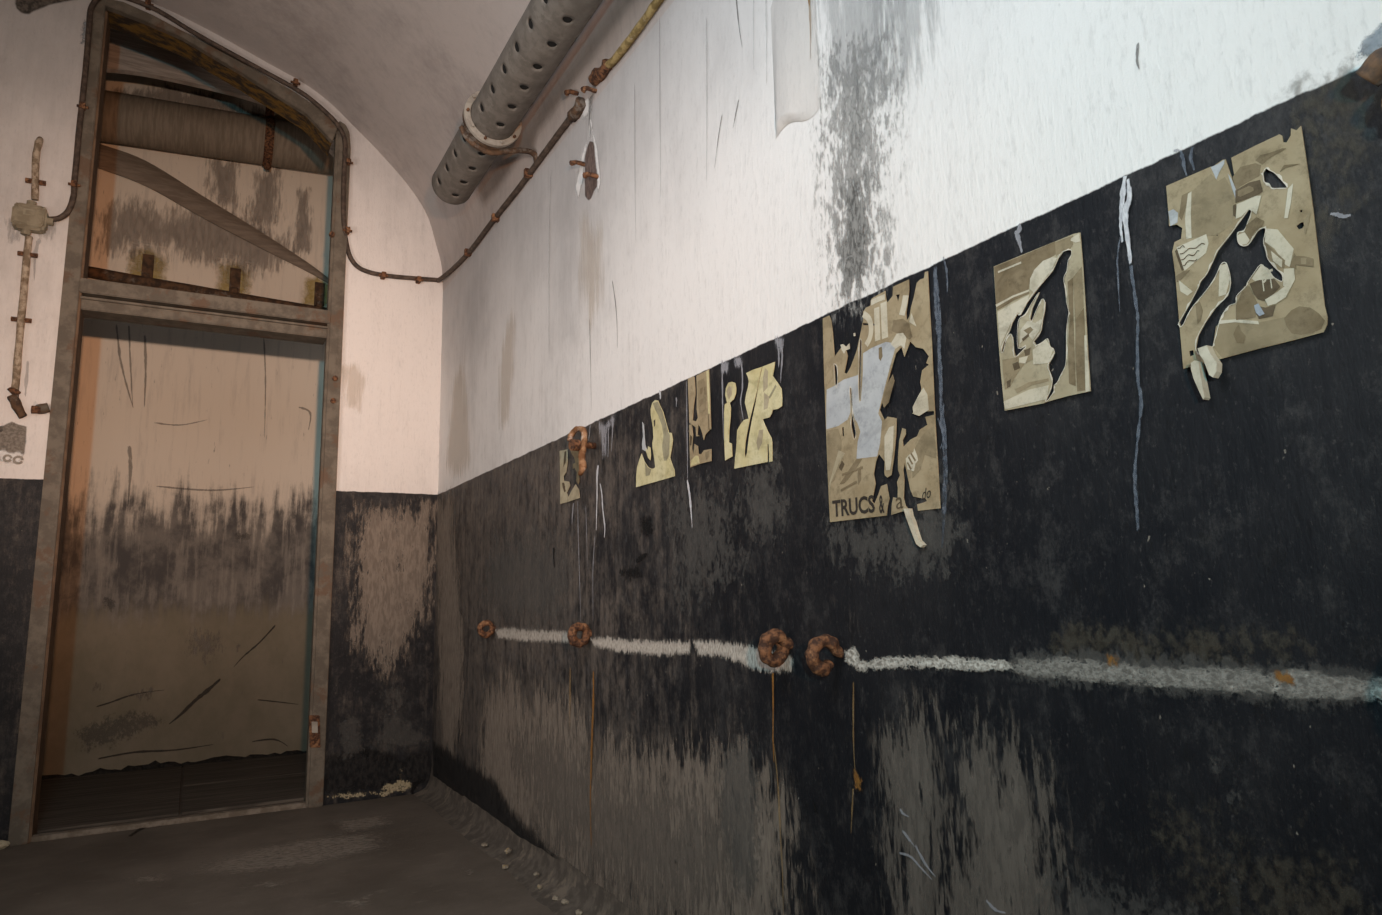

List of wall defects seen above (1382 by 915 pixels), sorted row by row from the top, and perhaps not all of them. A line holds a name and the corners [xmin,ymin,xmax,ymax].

spalling [576,95,600,200]
water stain [819,31,898,313]
water stain [325,744,554,857]
rust [772,673,783,891]
rust [851,683,862,829]